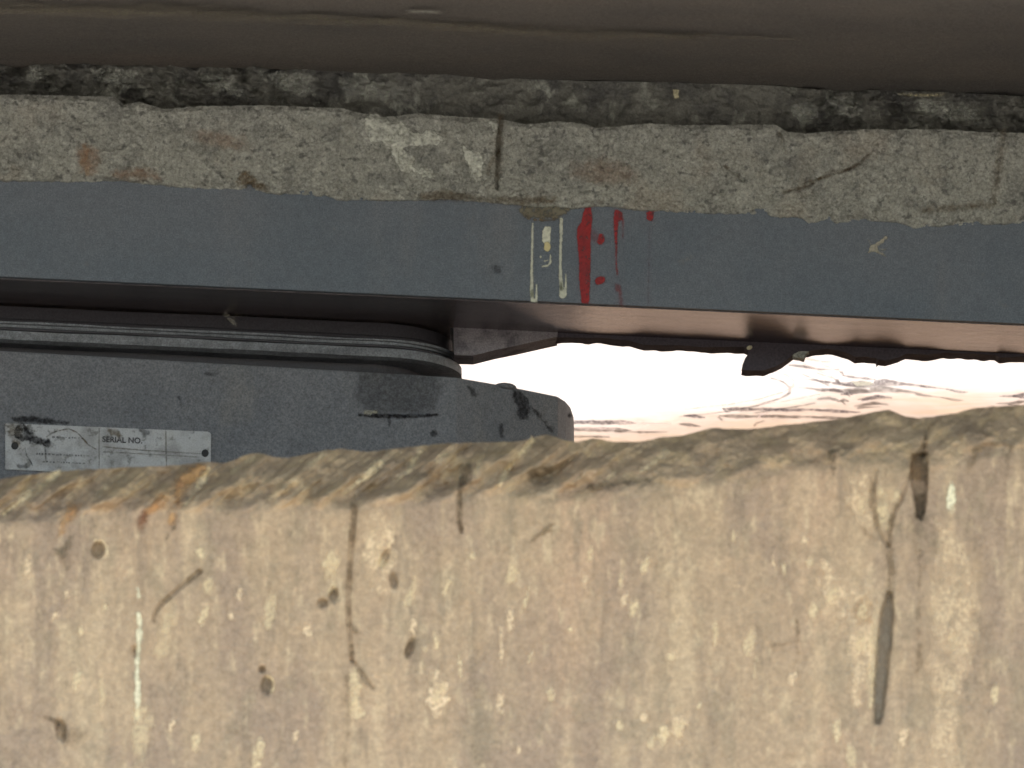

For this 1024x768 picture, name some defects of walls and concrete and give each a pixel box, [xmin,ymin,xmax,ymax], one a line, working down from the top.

corrosion [138,464,207,539]
crack [347,504,355,580]
crack [888,496,903,580]